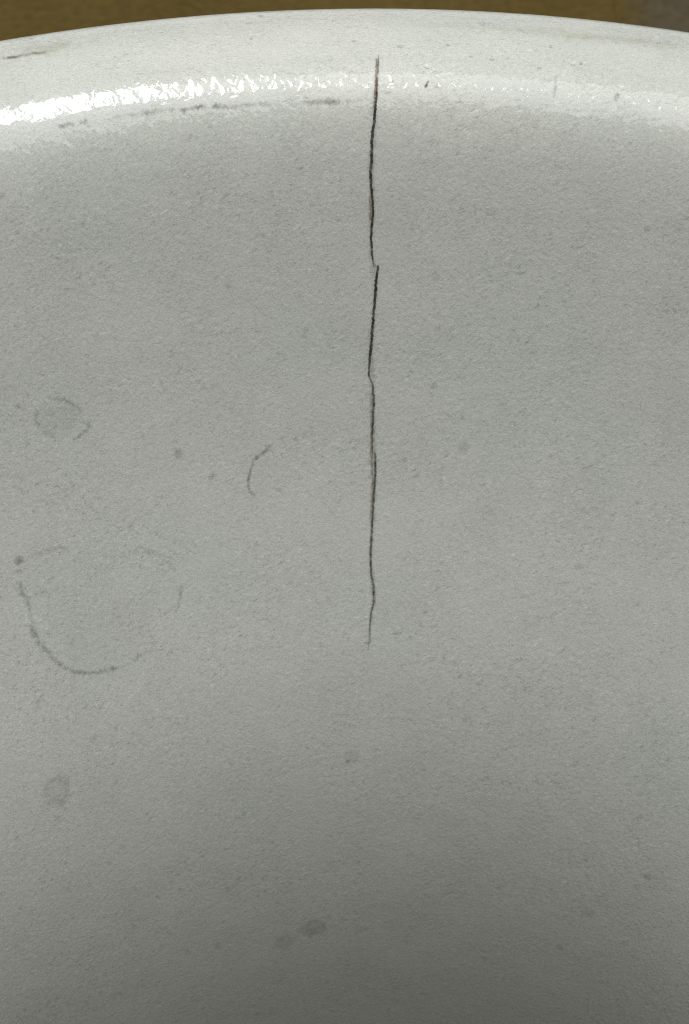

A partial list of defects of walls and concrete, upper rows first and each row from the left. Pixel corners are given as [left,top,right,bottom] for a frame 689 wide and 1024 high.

crack [368,59,379,621]